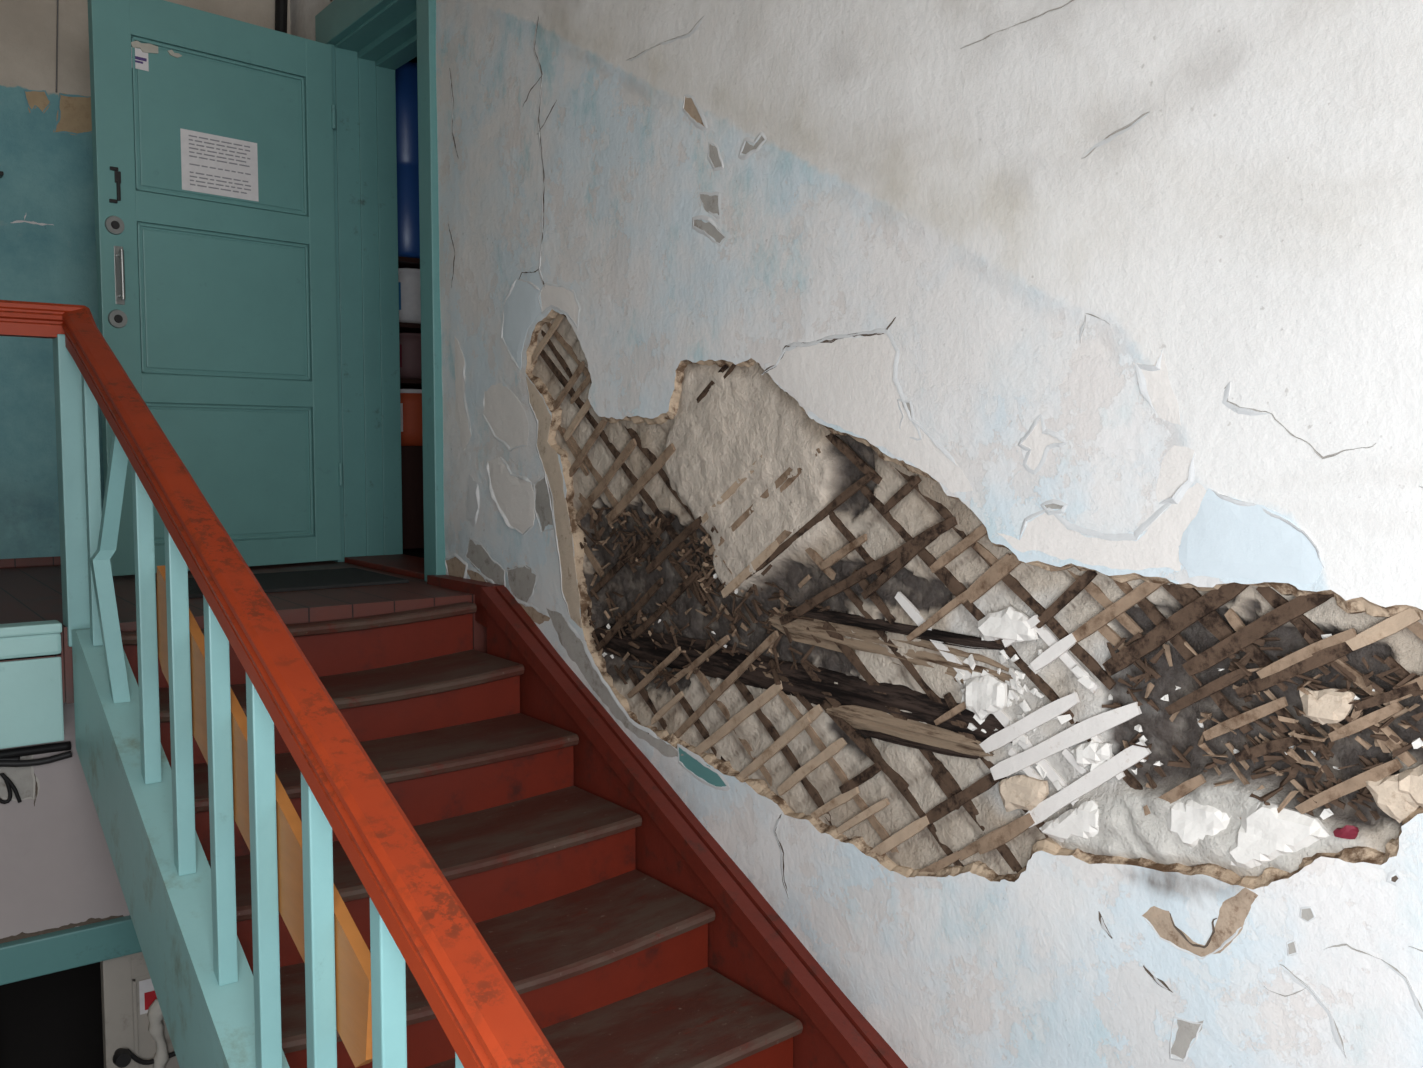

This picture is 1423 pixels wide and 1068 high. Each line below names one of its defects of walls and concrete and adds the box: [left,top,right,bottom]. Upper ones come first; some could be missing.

crack [627,16,704,61]
crack [961,0,1074,49]
peeling [23,90,92,135]
crack [519,16,557,286]
peeling [682,94,767,171]
crack [1081,112,1150,159]
peeling [692,191,726,246]
crack [1222,382,1376,459]
spalling [445,309,1423,960]